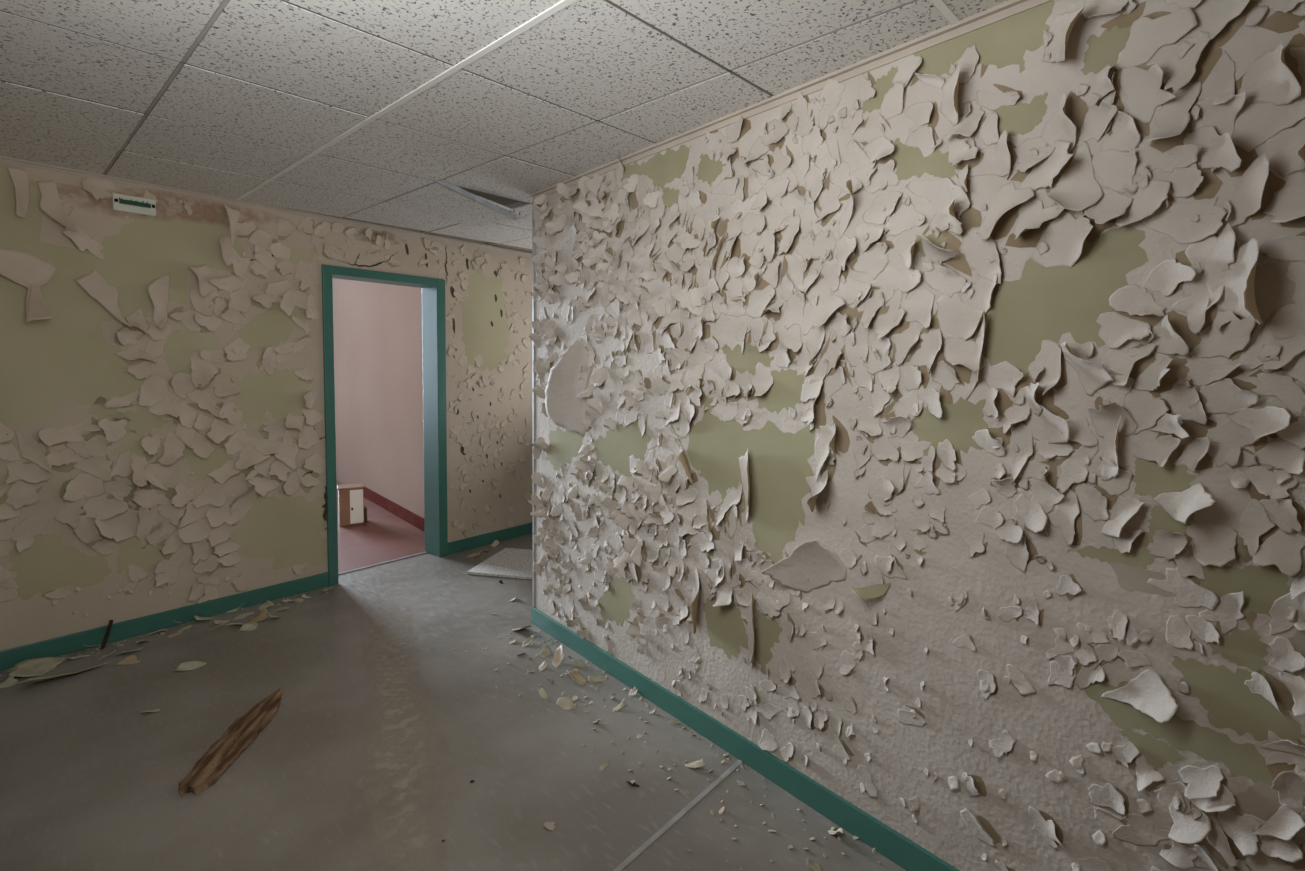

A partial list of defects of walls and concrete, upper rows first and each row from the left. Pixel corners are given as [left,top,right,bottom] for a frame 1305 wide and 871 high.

peeling [38,203,409,604]
peeling [418,0,1305,871]